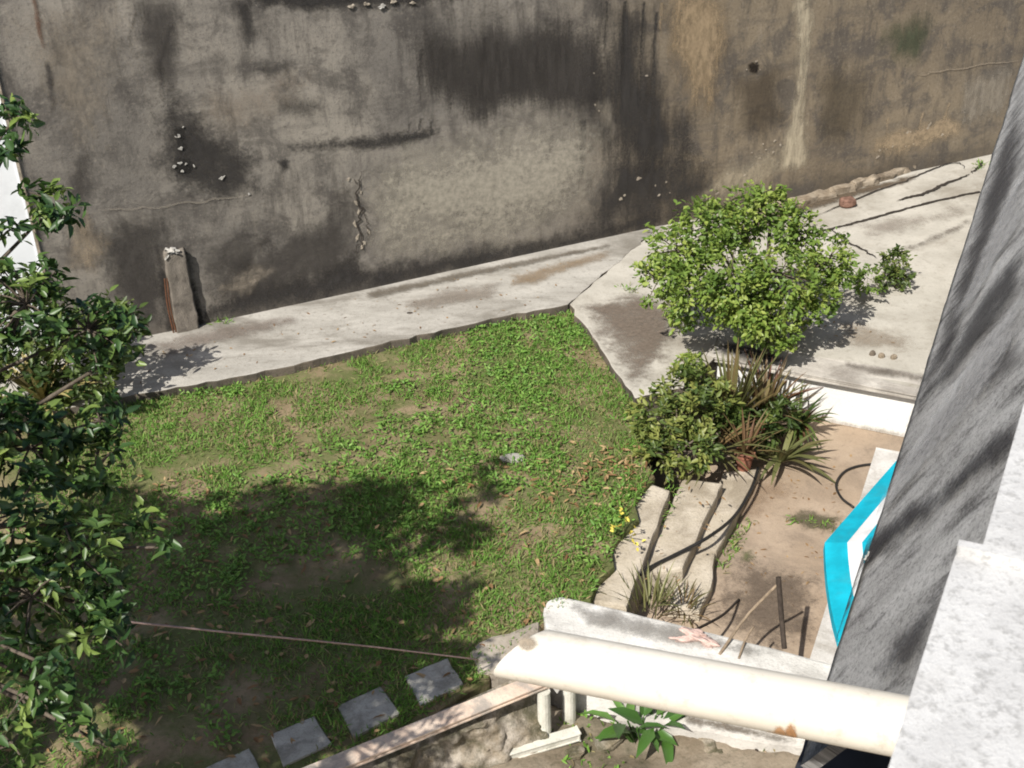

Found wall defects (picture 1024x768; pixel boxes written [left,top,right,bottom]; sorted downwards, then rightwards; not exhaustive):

spalling [173,126,195,173]
damp [206,0,813,317]
crack [348,169,370,256]
crack [820,162,982,258]
corrosion [773,725,796,738]